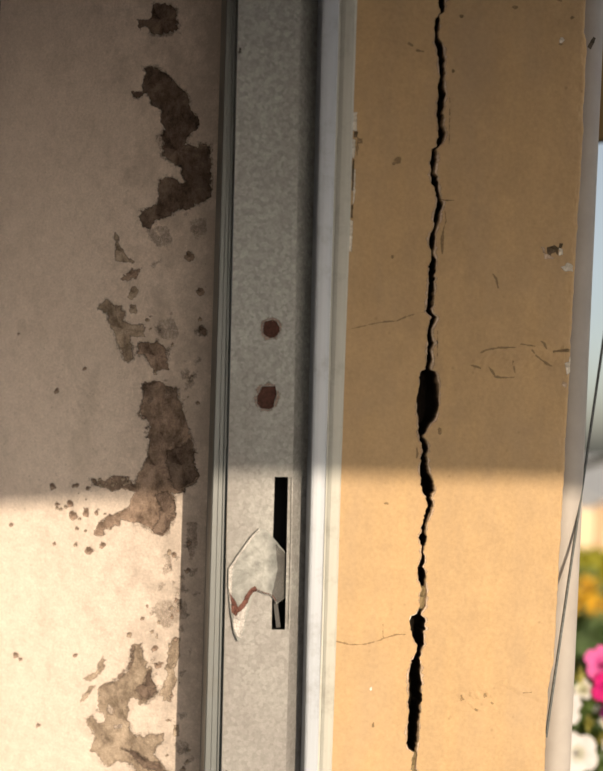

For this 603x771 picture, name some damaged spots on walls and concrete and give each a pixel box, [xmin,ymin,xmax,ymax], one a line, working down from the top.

flaking render [138,3,179,36]
peeling [132,66,212,229]
peeling [54,233,200,555]
crack [405,0,450,771]
peeling [81,621,180,771]